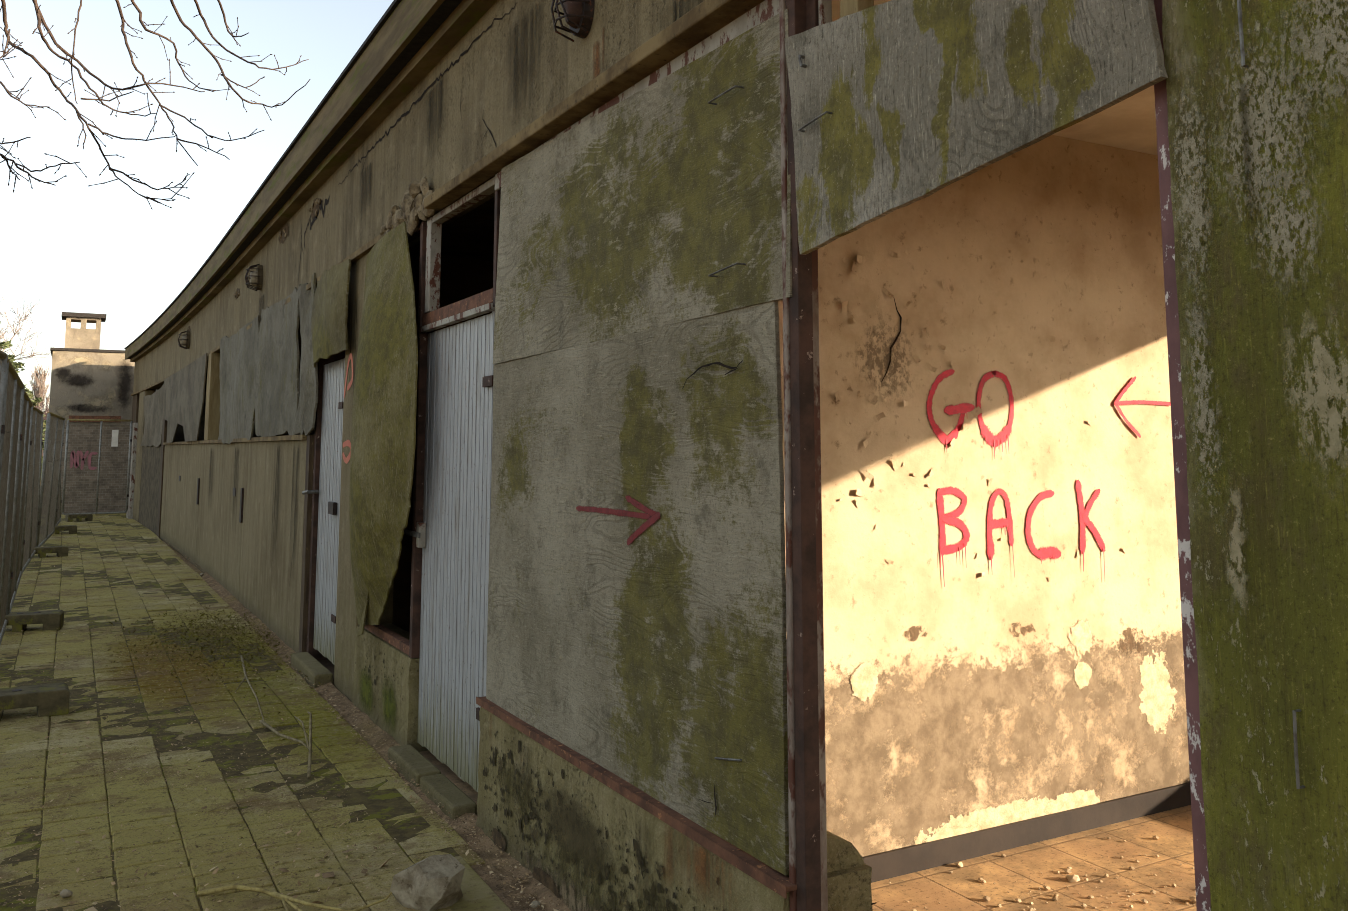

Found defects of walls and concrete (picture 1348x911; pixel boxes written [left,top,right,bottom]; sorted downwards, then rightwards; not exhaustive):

water stain [1241,90,1249,187]
peeling [1174,0,1348,282]
crack [881,299,902,382]
peeling [1189,308,1219,495]
peeling [1287,326,1348,459]
peeling [1228,490,1245,597]
spalling [483,731,725,911]